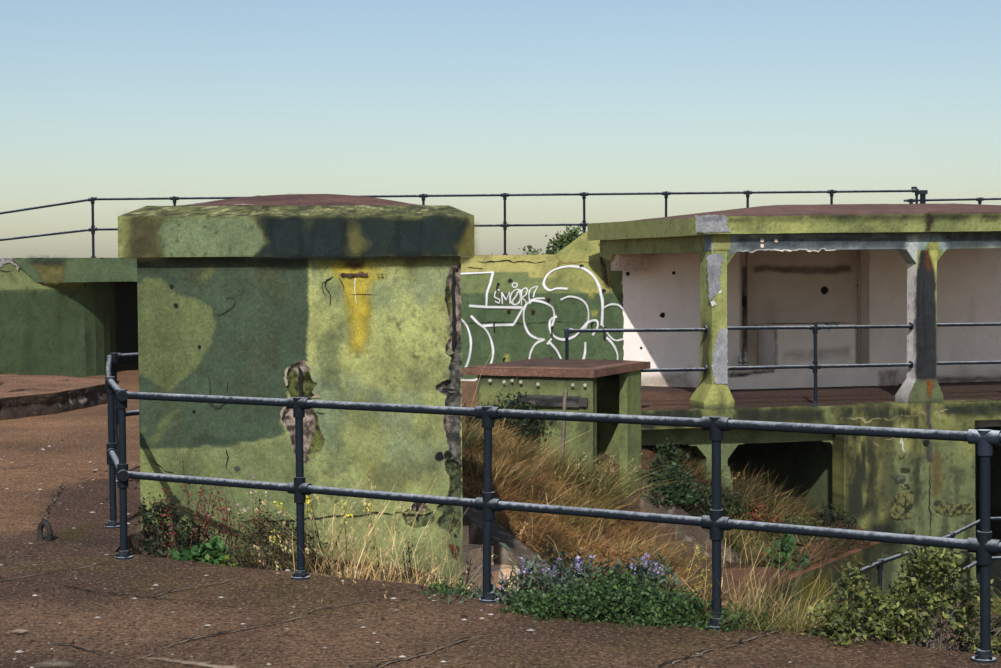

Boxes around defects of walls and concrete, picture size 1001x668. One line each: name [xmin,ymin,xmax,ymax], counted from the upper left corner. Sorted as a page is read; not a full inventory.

crack [468,242,603,273]
peeling [706,253,724,306]
peeling [711,328,729,384]
spalling [279,360,325,464]
spalling [402,262,463,561]
crack [841,409,948,446]
crack [886,465,964,556]